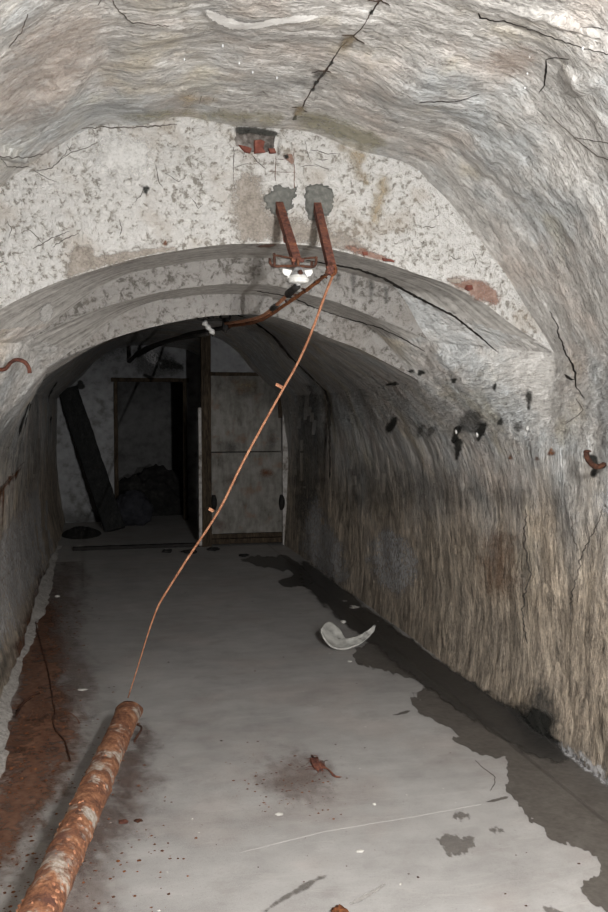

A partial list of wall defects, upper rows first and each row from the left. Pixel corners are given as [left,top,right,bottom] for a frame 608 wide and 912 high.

crack [98,0,169,27]
crack [292,0,390,120]
crack [478,13,608,92]
crack [0,124,177,182]
spalling [235,127,293,164]
crack [306,260,499,353]
crack [549,311,584,423]
leakage [242,390,608,912]